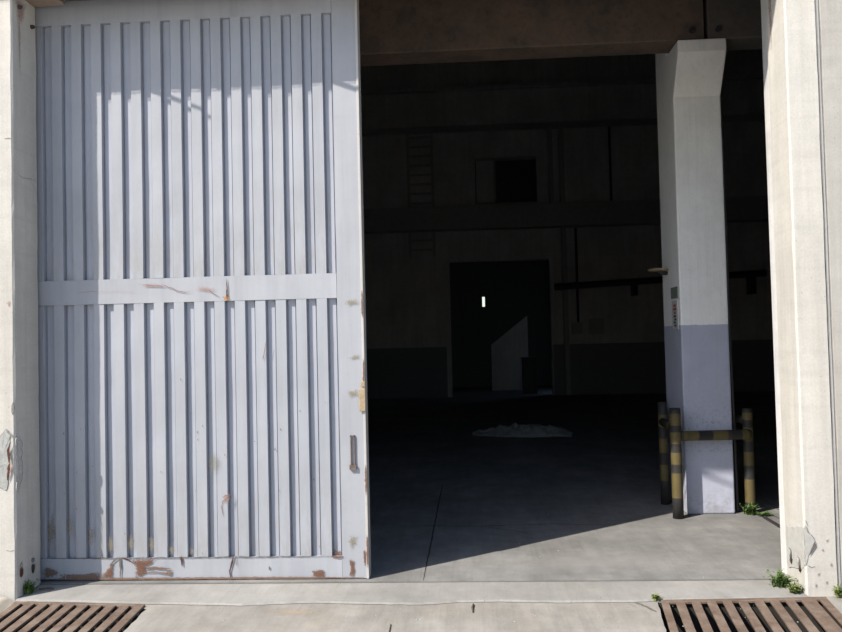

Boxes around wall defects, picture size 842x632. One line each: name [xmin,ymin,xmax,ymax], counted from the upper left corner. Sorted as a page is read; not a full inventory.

spalling [0,429,23,492]
corrosion [40,537,368,580]
spalling [786,520,824,572]